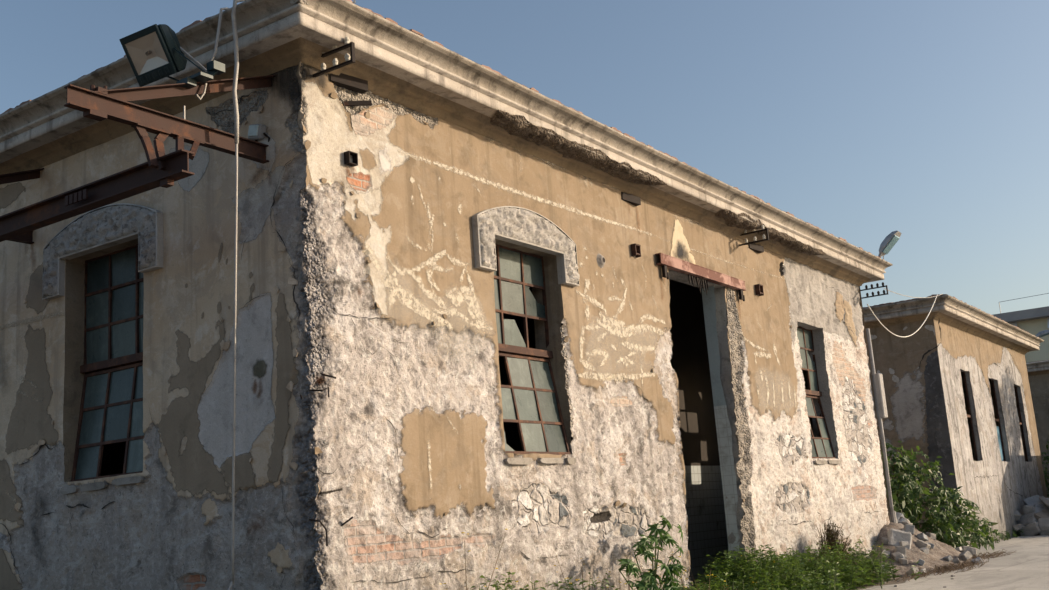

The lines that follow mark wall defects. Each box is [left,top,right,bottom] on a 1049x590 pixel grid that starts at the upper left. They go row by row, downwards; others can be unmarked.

spalling [0,61,691,590]
spalling [735,292,926,561]
spalling [925,325,1043,557]